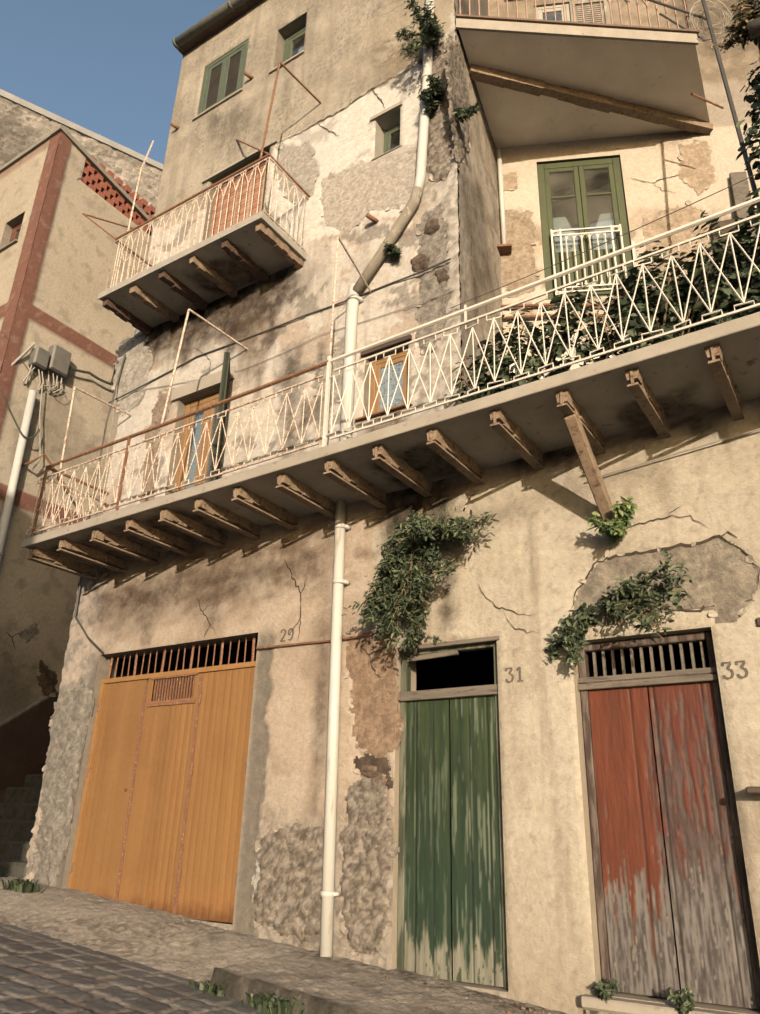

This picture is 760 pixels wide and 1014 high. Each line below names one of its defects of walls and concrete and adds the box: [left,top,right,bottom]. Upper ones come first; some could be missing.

peeling [275,34,471,235]
crack [285,561,307,637]
flaking render [574,538,758,627]
flaking render [28,660,94,885]
flaking render [253,819,324,944]
flaking render [339,628,405,956]